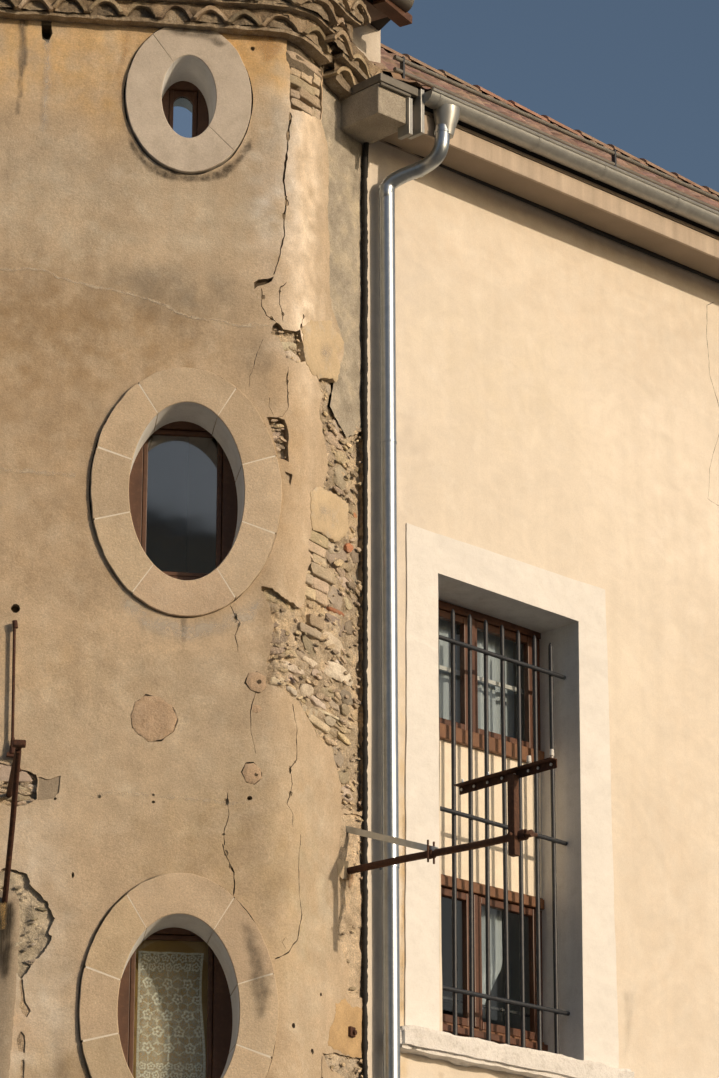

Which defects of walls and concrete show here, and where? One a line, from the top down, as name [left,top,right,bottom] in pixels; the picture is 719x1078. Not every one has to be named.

crack [249,113,304,418]
spalling [261,51,363,998]
spalling [0,763,61,807]
crack [222,793,235,895]
crack [275,707,302,959]
spalling [0,868,55,1017]
spalling [17,1032,25,1078]
spalling [311,1049,363,1078]